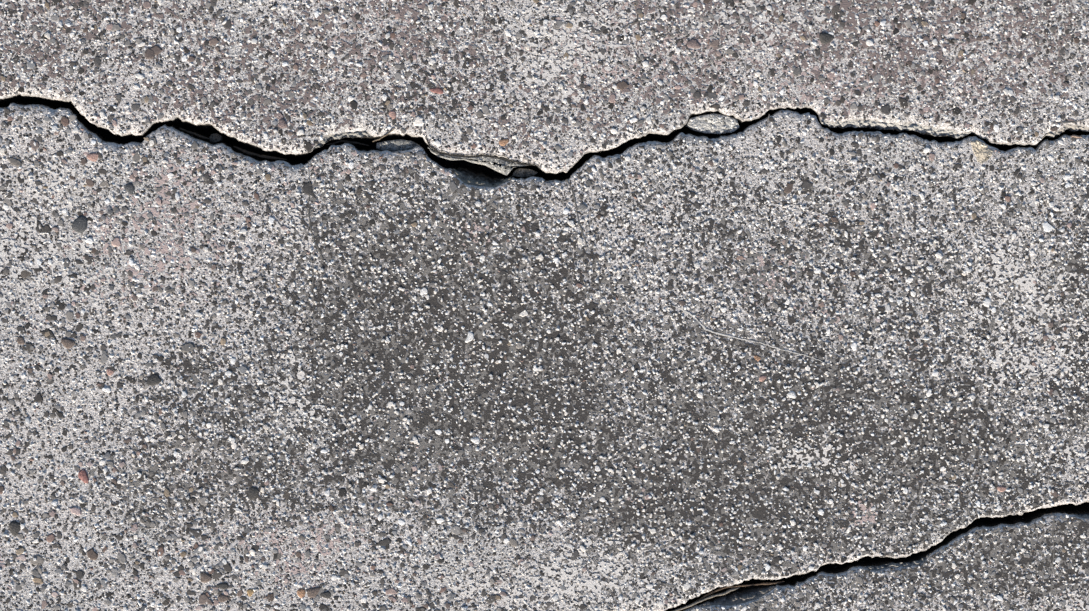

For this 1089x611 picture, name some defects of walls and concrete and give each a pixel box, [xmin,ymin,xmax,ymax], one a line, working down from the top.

crack [0,33,1089,329]
crack [667,502,1089,611]